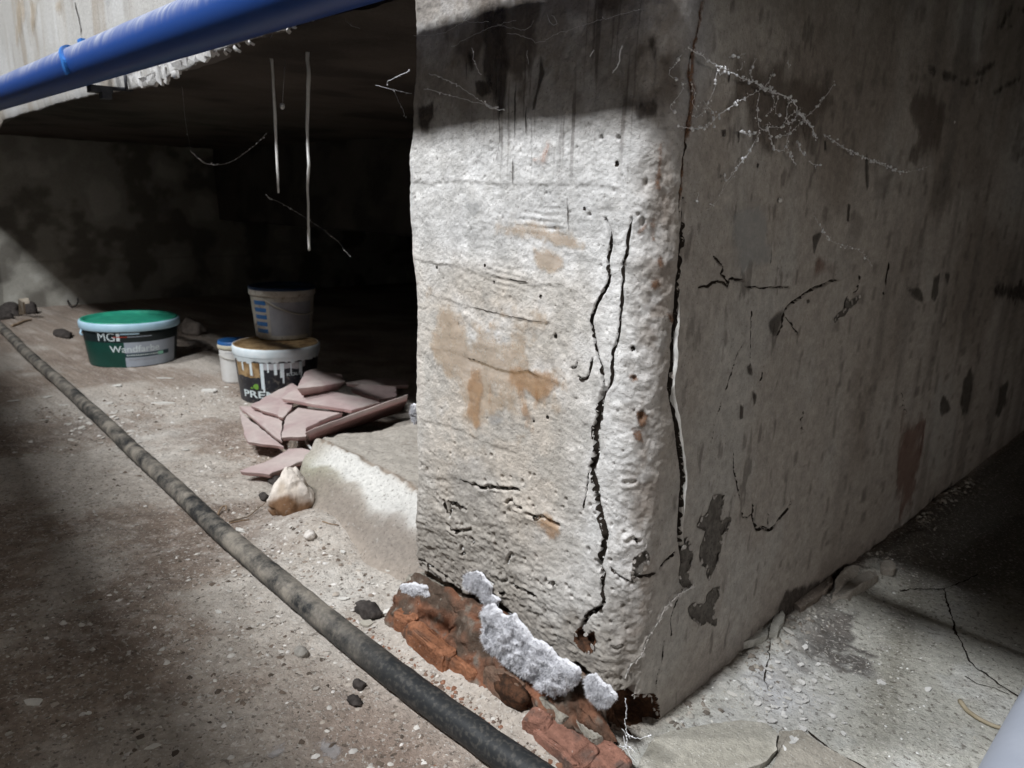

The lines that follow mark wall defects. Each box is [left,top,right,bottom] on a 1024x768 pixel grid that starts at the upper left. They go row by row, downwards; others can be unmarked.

crack [571,23,837,627]
water stain [400,581,430,598]
water stain [461,570,618,711]
peeling [678,494,732,626]
crack [901,574,1018,696]